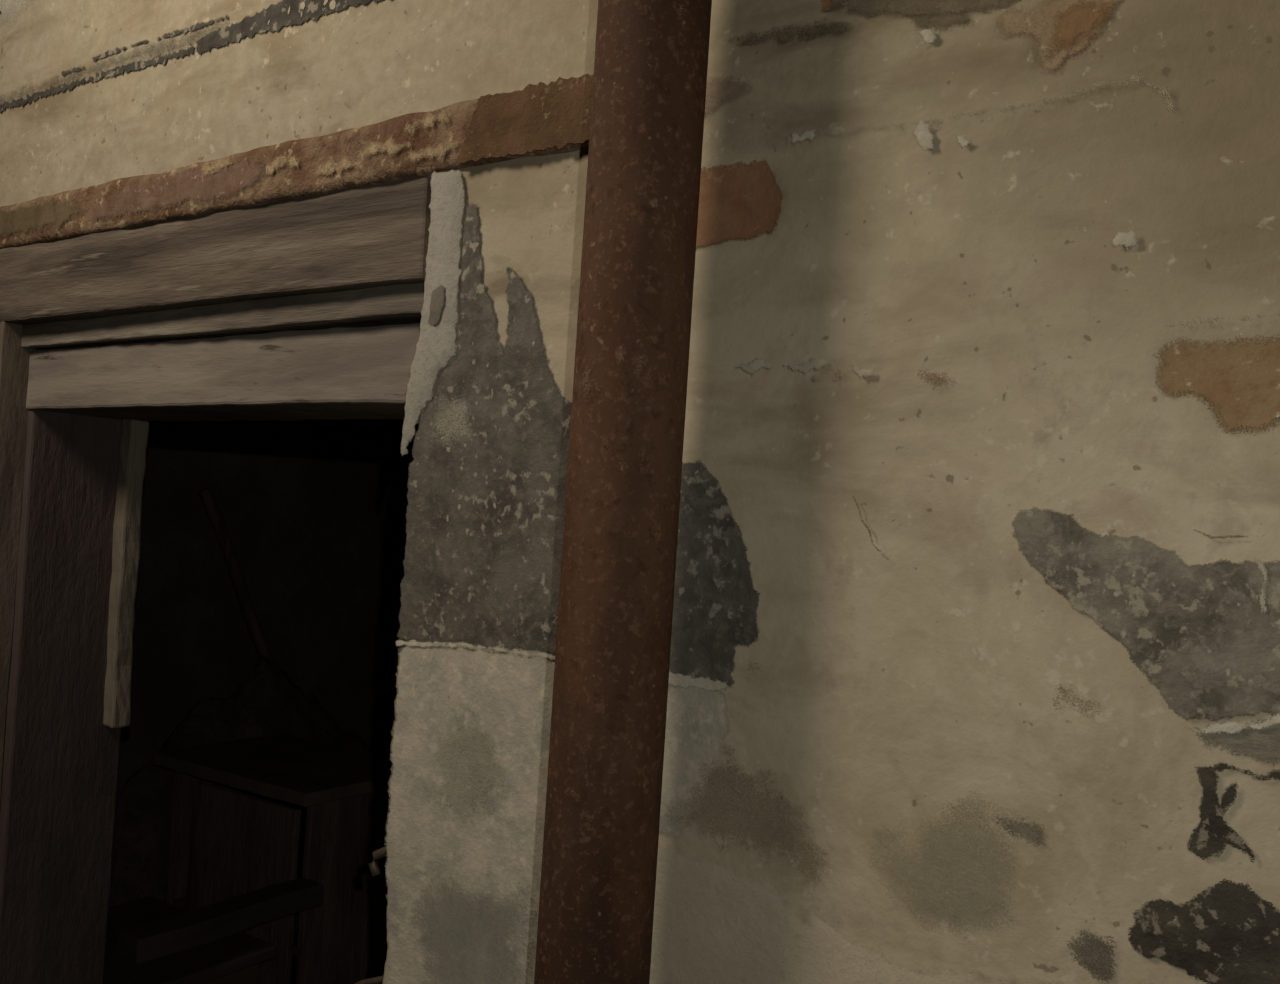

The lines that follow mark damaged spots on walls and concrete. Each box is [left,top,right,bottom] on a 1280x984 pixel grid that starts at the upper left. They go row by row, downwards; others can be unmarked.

flaking render [696,160,783,248]
flaking render [1155,315,1280,436]
peeling [384,203,572,984]
peeling [659,460,760,838]
peeling [1011,507,1280,862]
peeling [1067,878,1280,984]